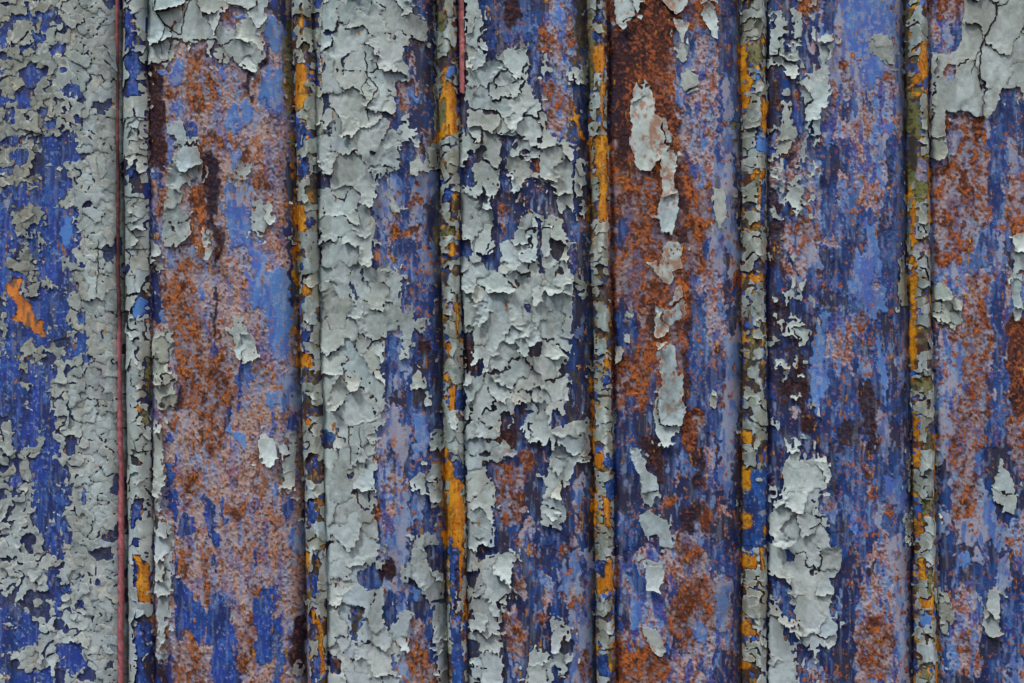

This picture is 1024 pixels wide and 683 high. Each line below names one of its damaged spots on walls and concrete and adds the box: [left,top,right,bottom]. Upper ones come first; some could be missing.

corrosion [148,39,219,168]
corrosion [160,130,239,455]
peeling [0,0,702,683]
corrosion [604,0,719,487]
peeling [663,0,890,683]
peeling [841,0,1024,683]
corrosion [928,114,992,268]
corrosion [948,274,1024,520]
crack [971,0,1009,90]
corrosion [613,636,672,683]
corrosion [660,496,716,650]
corrosion [856,615,896,682]